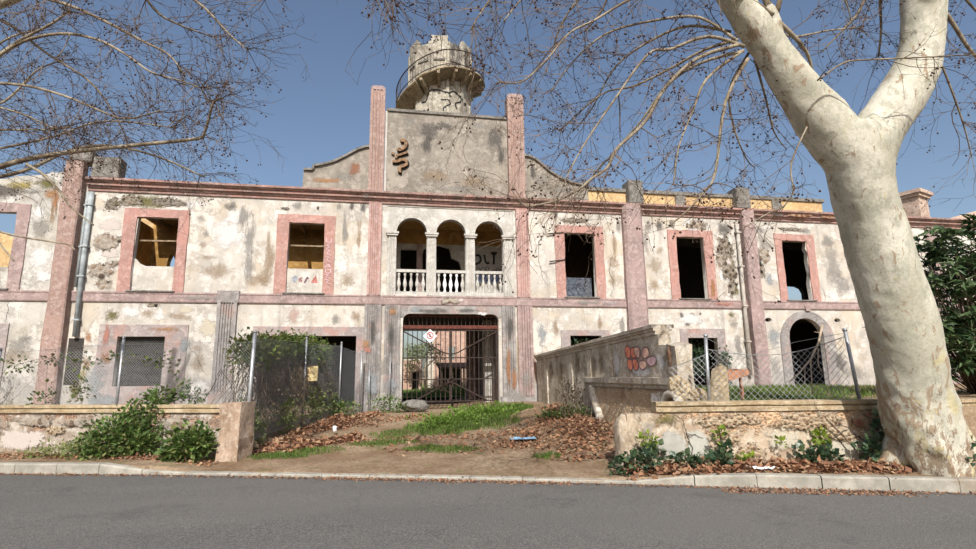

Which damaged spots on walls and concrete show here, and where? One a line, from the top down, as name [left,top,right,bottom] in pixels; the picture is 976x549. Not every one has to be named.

flaking render [86,193,194,289]
leakage [227,204,254,278]
leakage [265,238,273,272]
flaking render [682,217,739,298]
leakage [823,236,849,293]
flaking render [0,414,95,450]
flaking render [156,417,195,431]
flaking render [692,411,881,460]